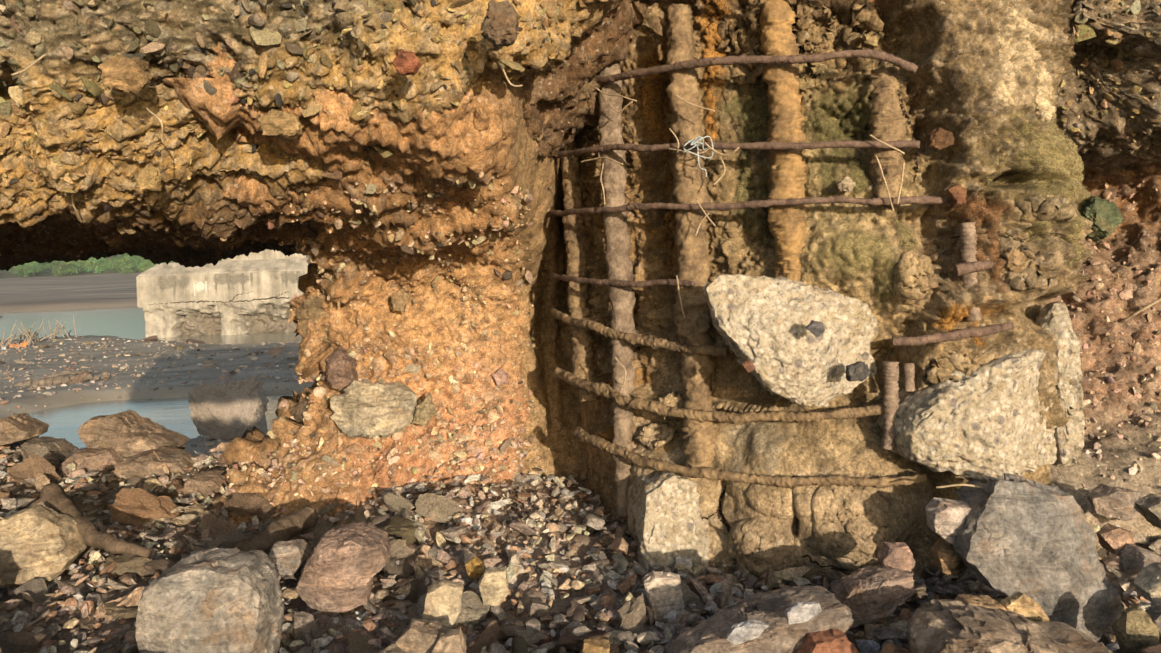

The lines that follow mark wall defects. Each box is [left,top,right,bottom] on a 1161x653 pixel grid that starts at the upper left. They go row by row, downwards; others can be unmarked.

corrosion [695,0,731,139]
spalling [716,7,765,92]
spalling [792,0,884,92]
corrosion [640,55,677,287]
spalling [664,98,676,210]
water stain [803,91,870,194]
water stain [984,0,1091,266]
water stain [808,217,915,309]
spalling [925,353,981,385]
corrosion [599,427,614,443]
spalling [634,392,687,455]